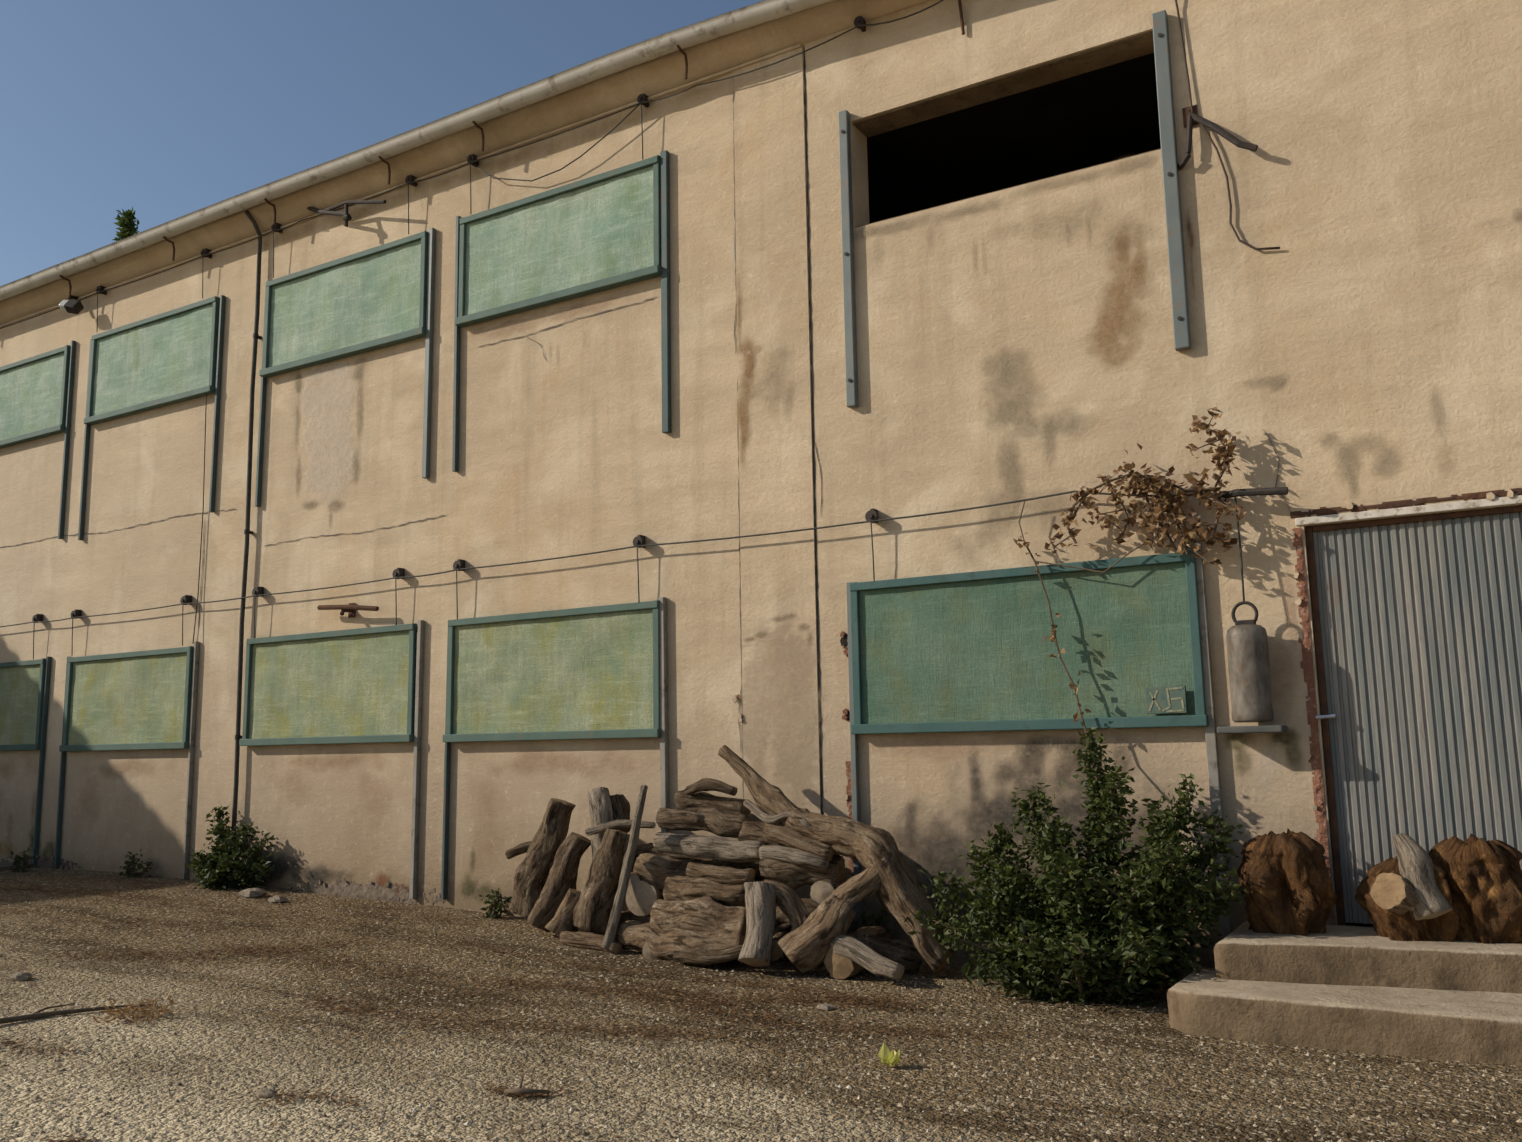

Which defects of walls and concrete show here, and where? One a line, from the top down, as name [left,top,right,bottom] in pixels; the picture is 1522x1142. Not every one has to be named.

leakage [739,344,754,440]
flaking render [1290,488,1522,878]